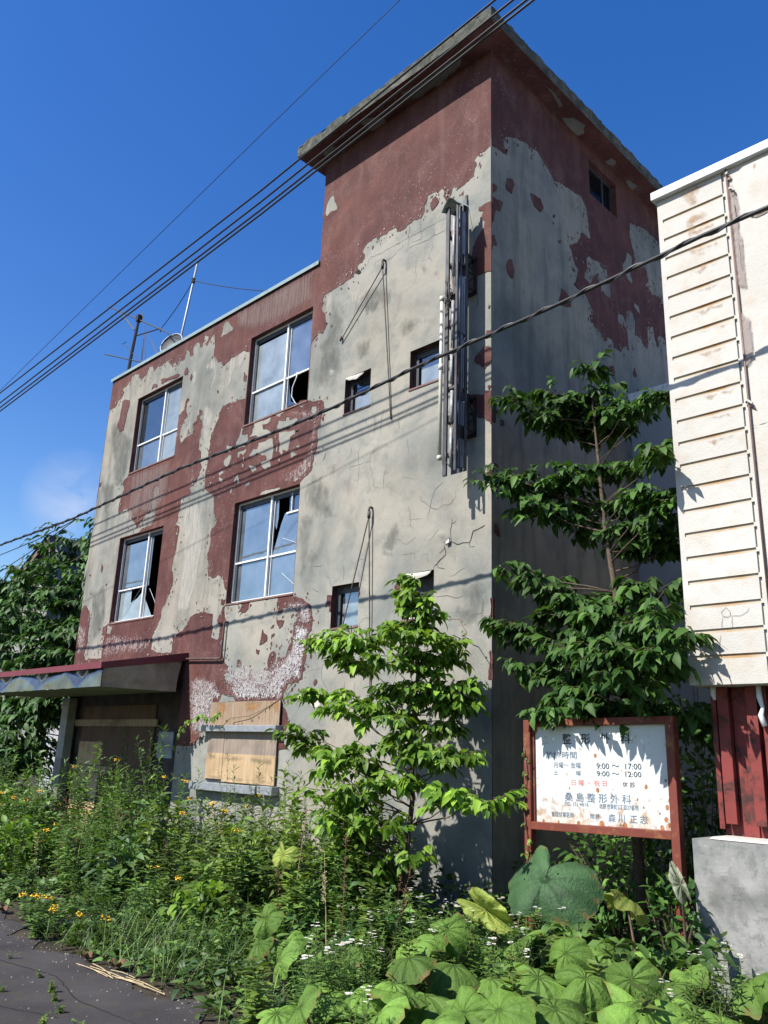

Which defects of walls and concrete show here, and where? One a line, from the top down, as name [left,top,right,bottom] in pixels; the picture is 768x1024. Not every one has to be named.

peeling [81,127,669,917]
crack [400,482,485,614]
leakage [190,604,311,733]